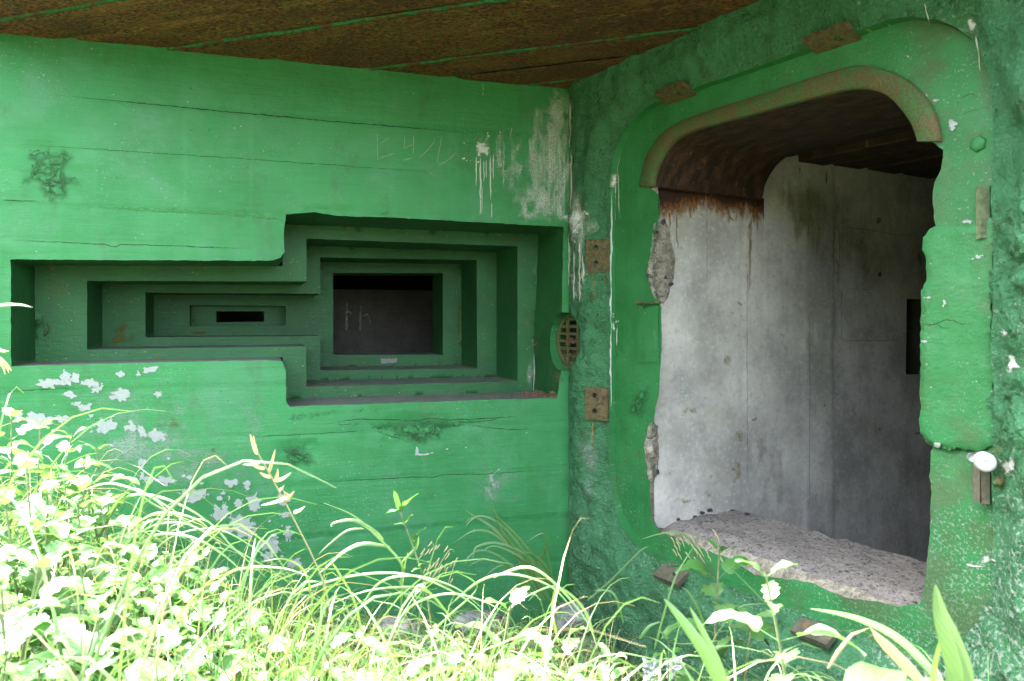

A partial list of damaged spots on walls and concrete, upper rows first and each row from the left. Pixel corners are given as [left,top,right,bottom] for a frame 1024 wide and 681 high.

water stain [515,103,596,302]
spalling [646,219,675,304]
rust [658,187,764,227]
peeling [12,366,303,576]
spalling [285,447,309,466]
spalling [630,391,906,607]